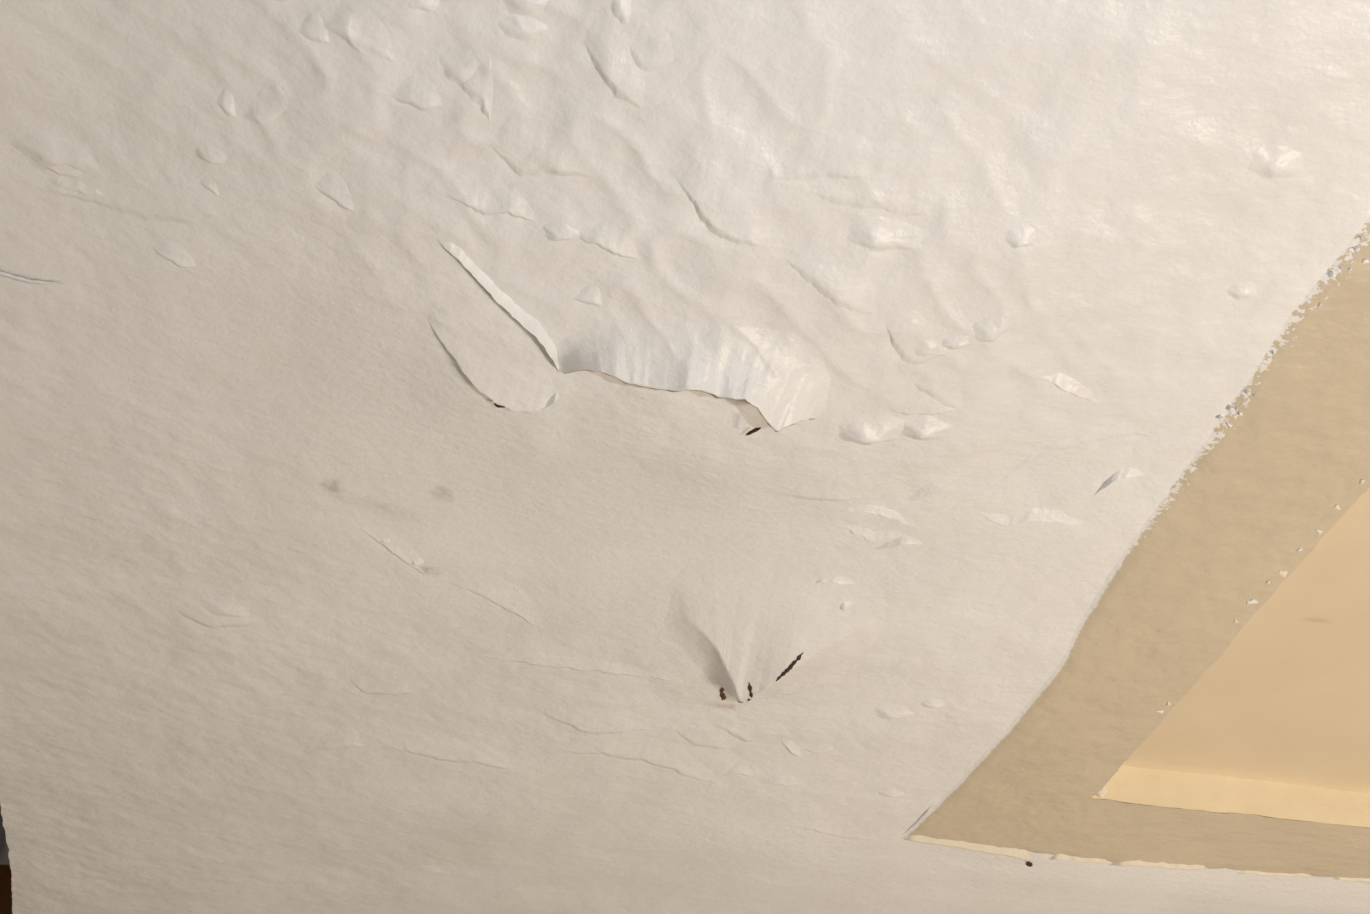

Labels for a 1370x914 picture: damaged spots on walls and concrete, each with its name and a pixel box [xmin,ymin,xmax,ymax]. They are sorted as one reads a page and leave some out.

peeling [427,240,831,435]
peeling [1096,468,1145,494]
peeling [903,835,1029,862]
peeling [1048,854,1208,870]